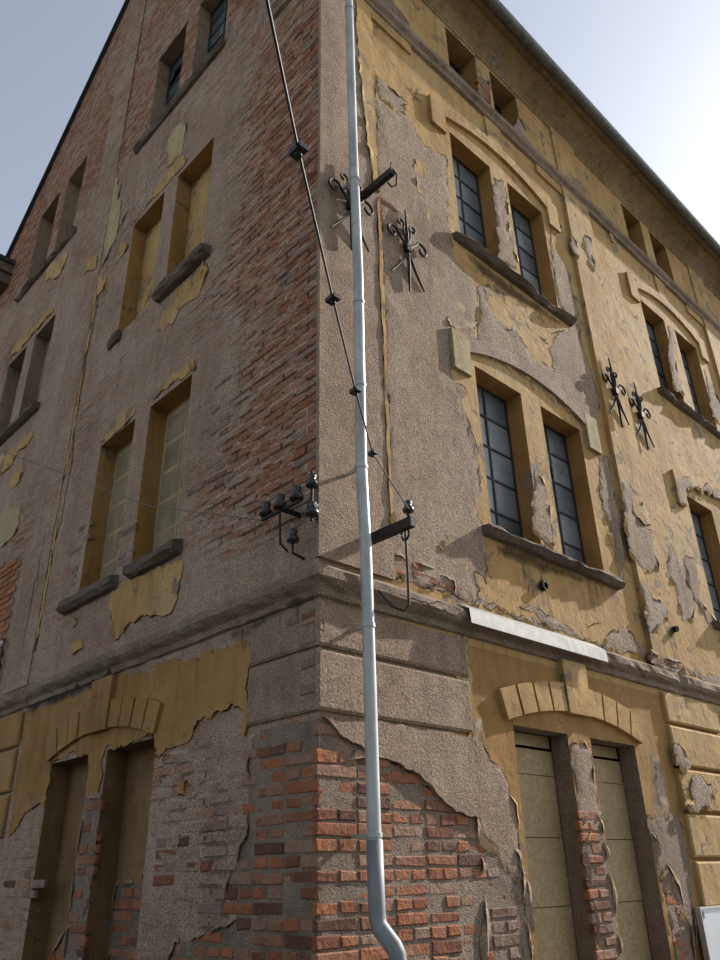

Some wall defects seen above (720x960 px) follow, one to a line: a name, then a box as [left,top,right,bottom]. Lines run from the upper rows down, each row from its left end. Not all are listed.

spalling [261,0,319,288]
spalling [293,395,316,507]
spalling [355,0,720,685]
flaking render [108,560,184,640]
spalling [3,638,389,960]
spalling [379,733,534,960]
spalling [570,738,623,960]
spalling [646,743,715,960]